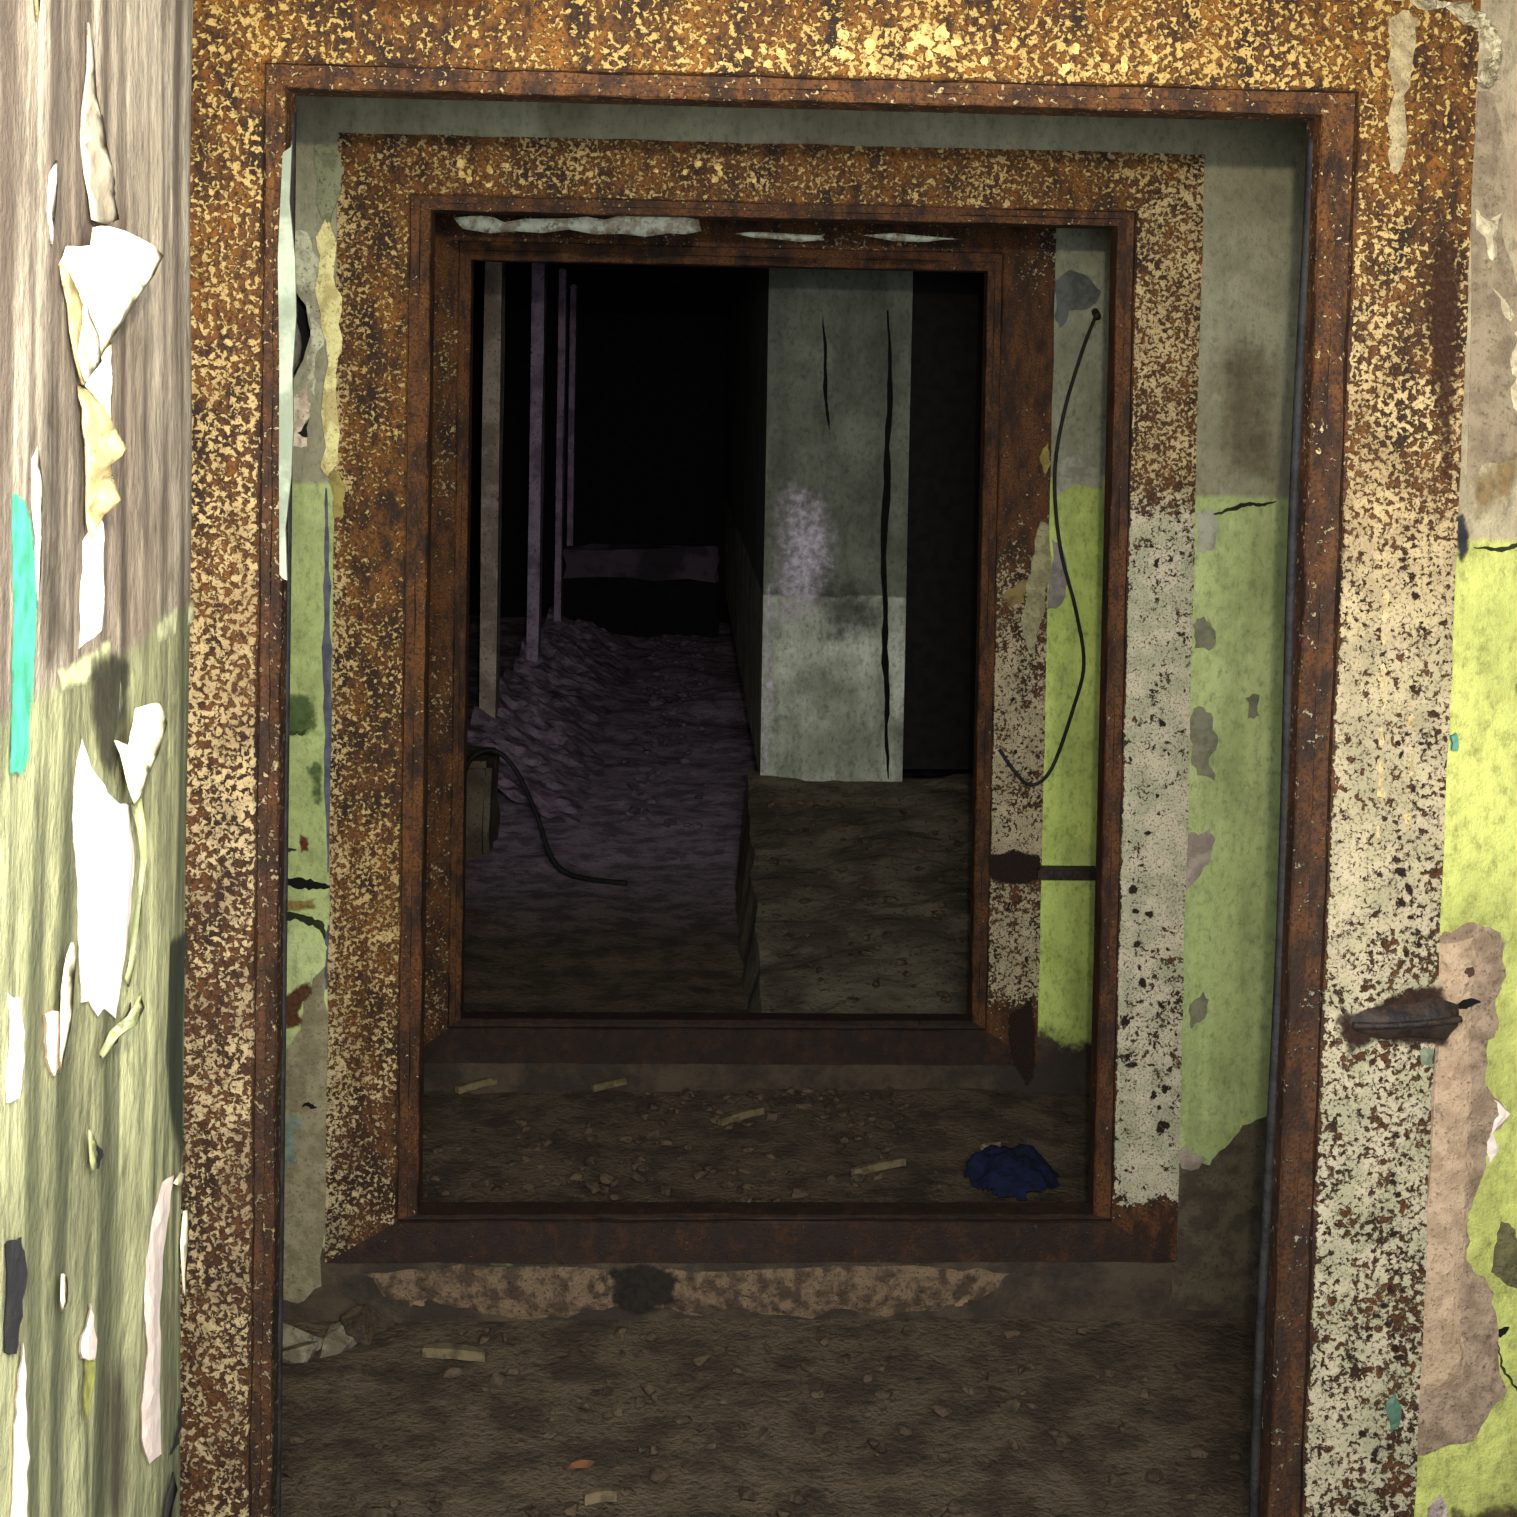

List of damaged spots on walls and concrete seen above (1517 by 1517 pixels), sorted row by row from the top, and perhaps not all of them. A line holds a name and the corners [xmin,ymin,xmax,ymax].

peeling [47,22,164,649]
corrosion [1425,232,1462,479]
water stain [1457,515,1469,560]
crack [1473,543,1517,552]
water stain [1478,461,1516,505]
peeling [43,702,168,1076]
corrosion [988,849,1041,885]
corrosion [1336,1013,1447,1052]
corrosion [1395,865,1423,958]
spalling [1385,922,1517,1456]
peeling [3,1237,30,1517]
peeling [140,1172,189,1517]